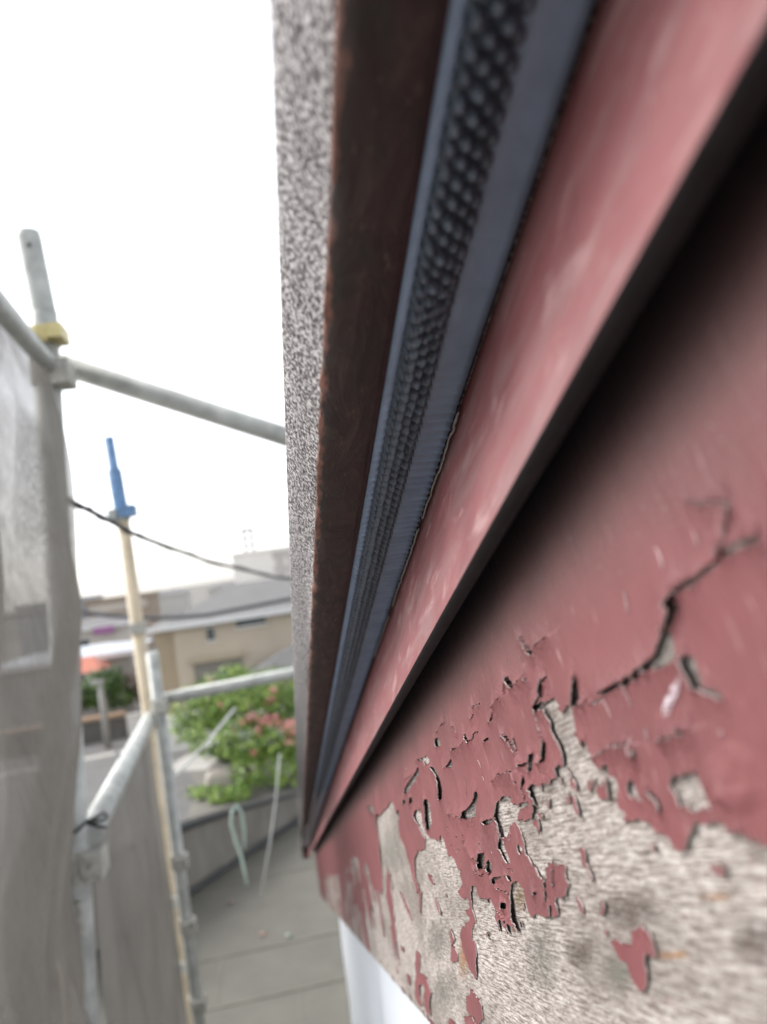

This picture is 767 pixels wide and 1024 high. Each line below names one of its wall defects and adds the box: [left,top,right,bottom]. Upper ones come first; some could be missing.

crack [683,536,760,589]
crack [595,666,649,702]
peeling [321,698,767,1024]